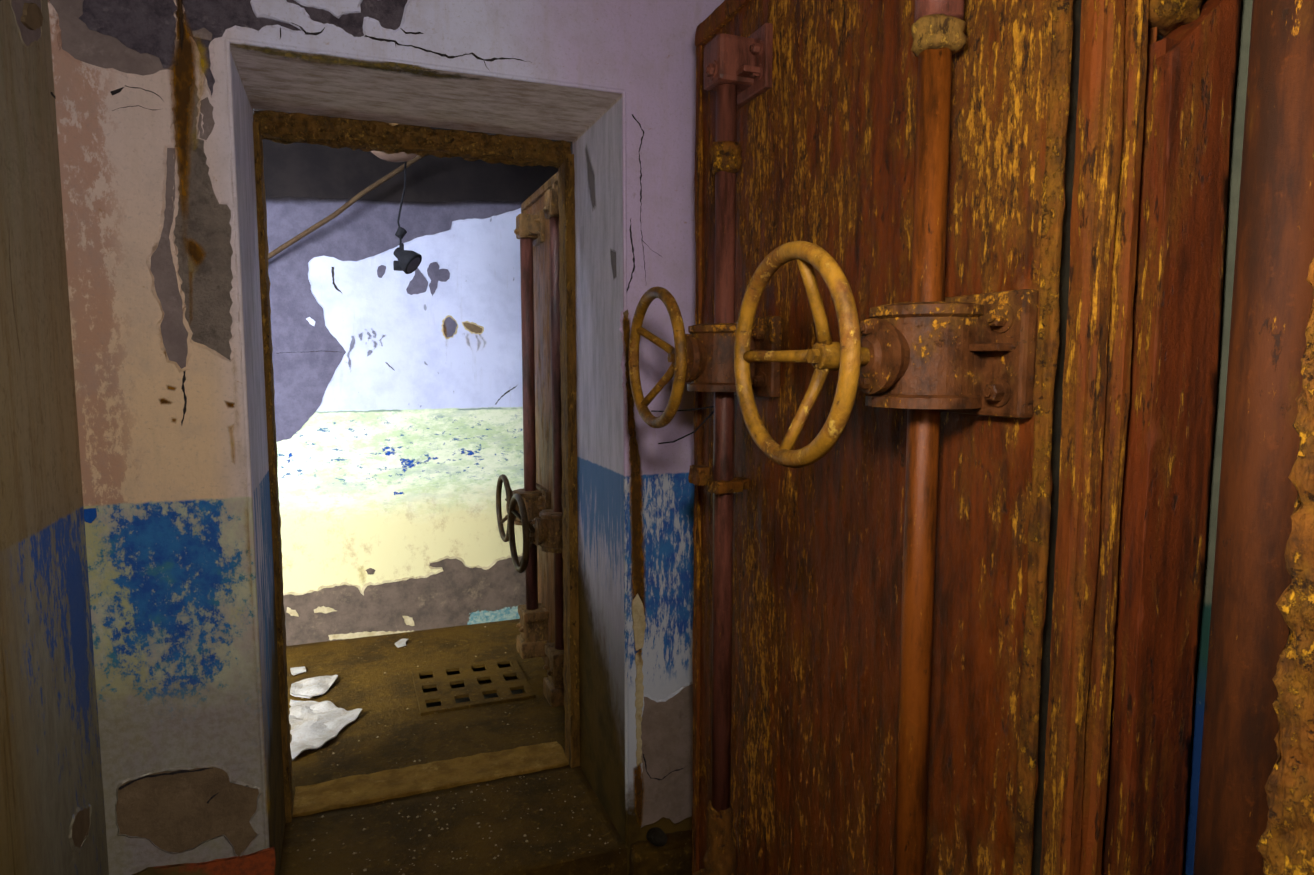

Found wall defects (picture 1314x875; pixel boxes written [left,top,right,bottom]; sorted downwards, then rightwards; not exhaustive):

crack [364,35,530,71]
rust [171,0,205,211]
flaking render [9,0,424,425]
rust [187,240,205,292]
peeling [262,139,558,443]
peeling [84,508,97,523]
flaking render [283,553,526,646]
flaking render [115,765,262,857]